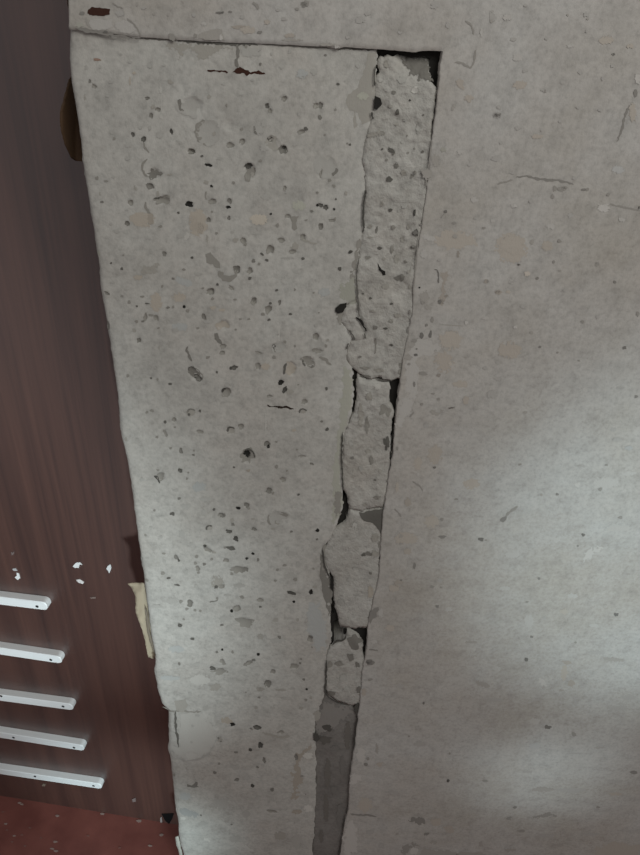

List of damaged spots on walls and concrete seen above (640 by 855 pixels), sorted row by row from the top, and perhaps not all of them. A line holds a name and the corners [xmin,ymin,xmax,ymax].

rust [87,7,110,16]
rust [207,67,265,76]
spalling [334,53,376,128]
hole [305,168,337,230]
crack [362,191,374,238]
crack [498,175,574,185]
crack [346,259,377,354]
crack [338,432,346,490]
spalling [360,496,383,556]
spalling [309,529,333,615]
crack [324,636,358,772]
crack [339,810,376,855]